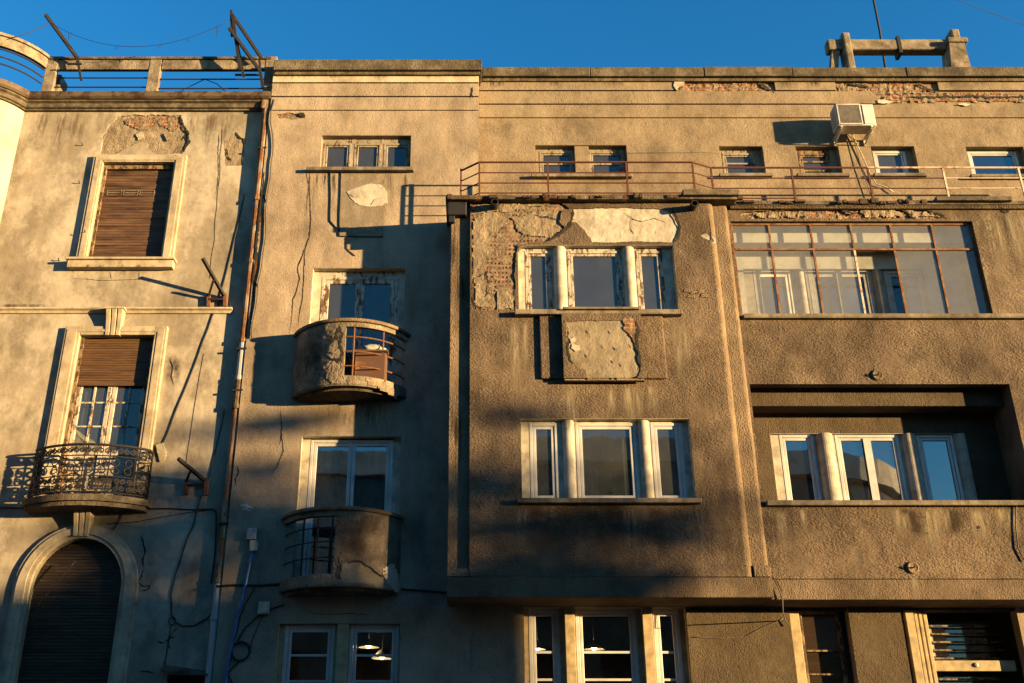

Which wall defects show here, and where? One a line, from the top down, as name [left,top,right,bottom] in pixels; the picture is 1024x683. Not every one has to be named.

flaking render [673,82,774,92]
flaking render [835,83,1024,106]
peeling [101,115,191,155]
peeling [223,132,246,166]
flaking render [736,196,948,220]
crack [289,173,311,333]
peeling [447,192,691,311]
peeling [323,322,344,383]
peeling [566,317,642,380]